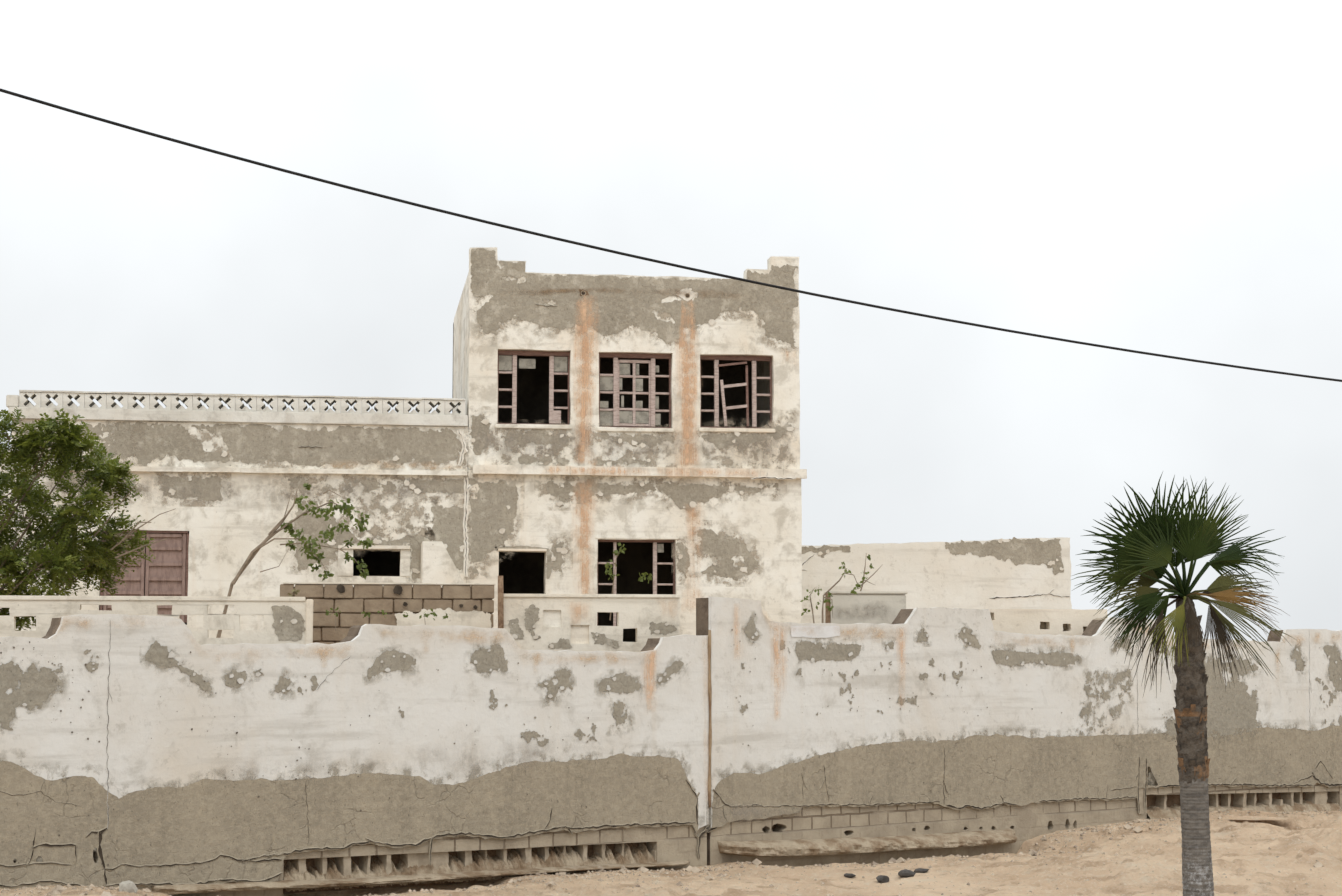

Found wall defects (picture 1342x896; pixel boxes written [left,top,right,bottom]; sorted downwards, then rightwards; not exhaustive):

peeling [471,248,798,350]
corrosion [575,302,627,473]
corrosion [669,304,697,473]
peeling [14,414,794,710]
peeling [945,537,1064,575]
crack [989,589,1070,599]
flaking render [0,627,1181,893]
crack [0,622,1342,889]
flaking render [1204,644,1342,812]